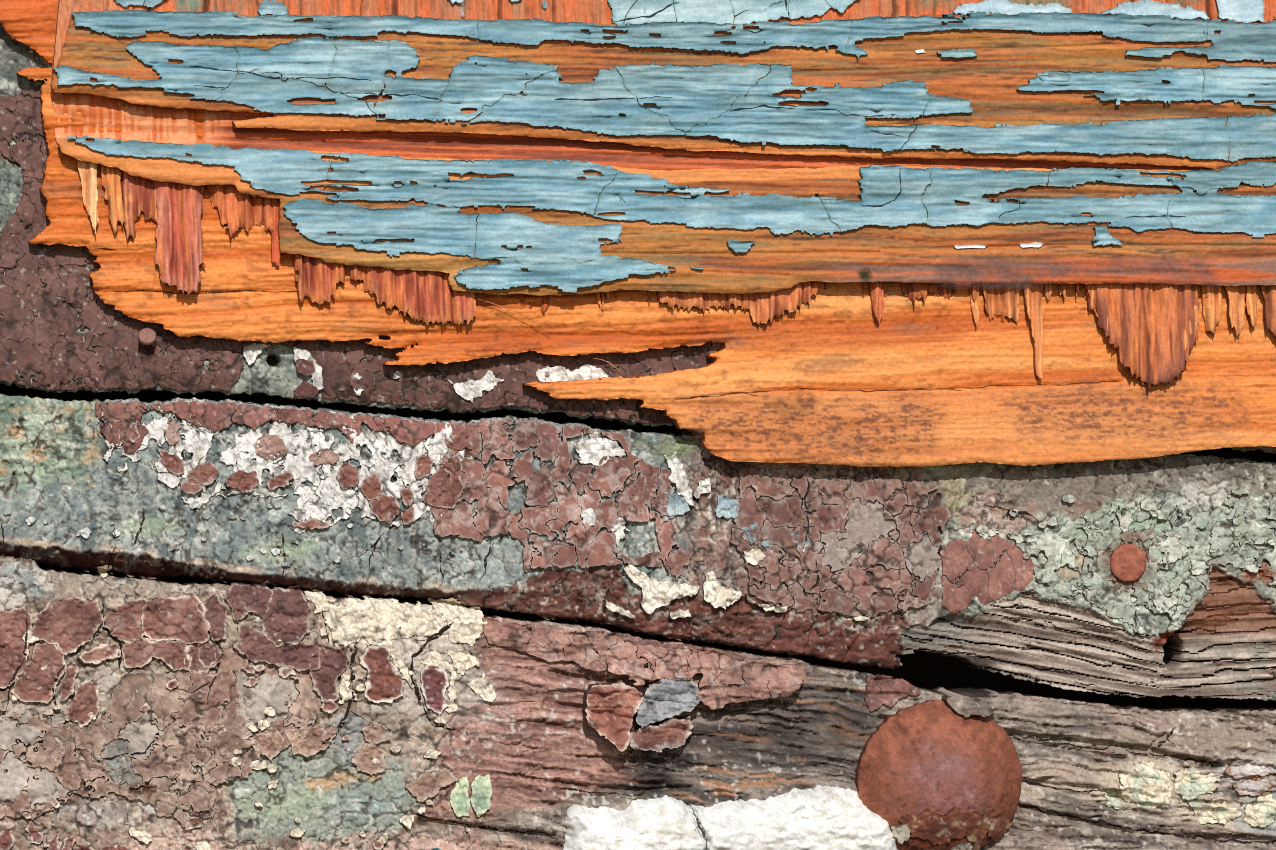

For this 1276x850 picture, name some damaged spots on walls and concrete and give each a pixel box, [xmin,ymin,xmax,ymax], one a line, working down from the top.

peeling [0,0,1276,634]
crack [108,512,145,568]
crack [359,533,384,568]
crack [480,542,491,579]
crack [803,478,820,594]
crack [988,505,1039,522]
crack [0,606,28,708]
crack [52,604,123,710]
crack [168,637,224,699]
crack [322,611,365,745]
peeling [0,581,806,850]
crack [409,622,455,730]